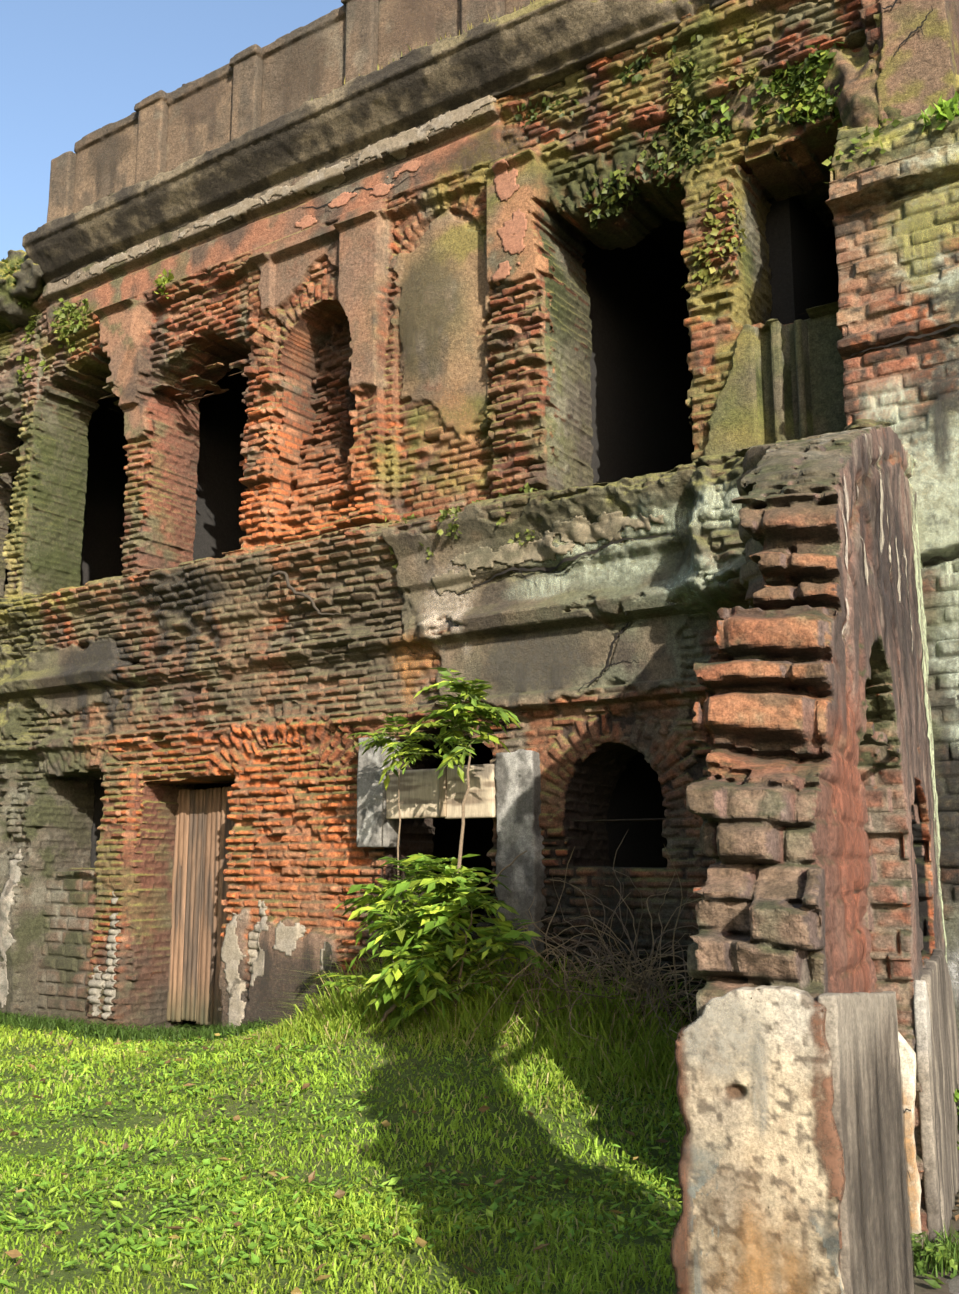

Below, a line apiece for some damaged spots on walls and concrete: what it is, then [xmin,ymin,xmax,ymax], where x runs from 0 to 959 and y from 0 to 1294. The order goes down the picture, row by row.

peeling [178,95,496,238]
leakage [434,128,535,176]
peeling [63,240,160,285]
leakage [913,349,959,465]
peeling [431,511,664,595]
crack [578,612,640,692]
spalling [109,575,429,1028]